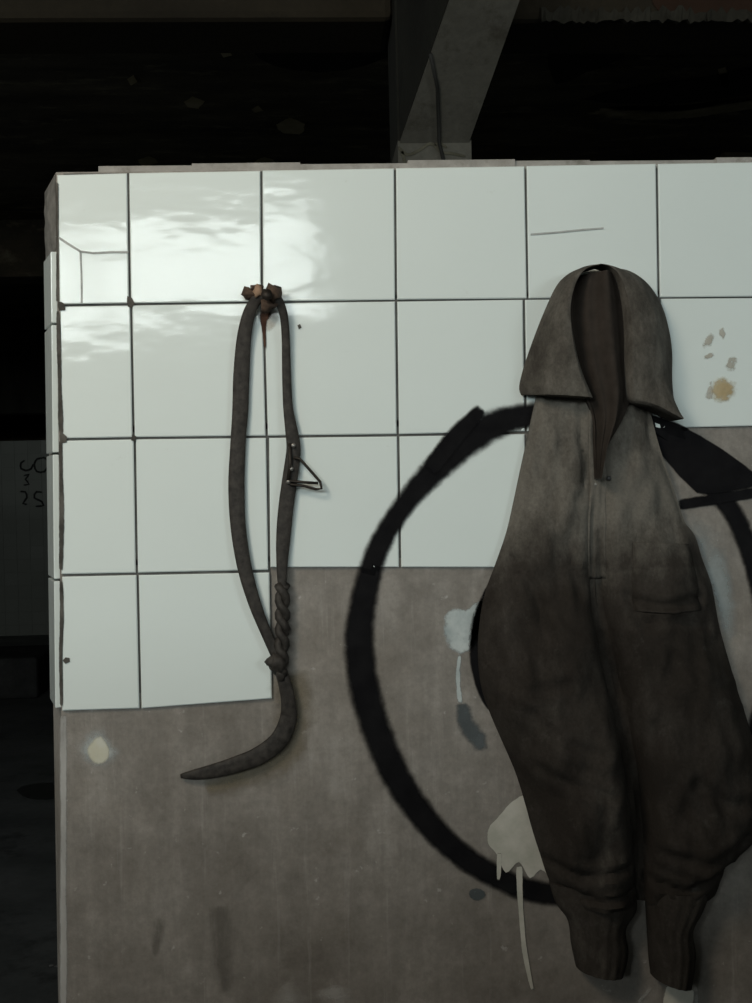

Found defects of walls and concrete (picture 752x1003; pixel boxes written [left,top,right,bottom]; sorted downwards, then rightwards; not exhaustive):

rust [705,328,725,359]
rust [707,379,733,400]